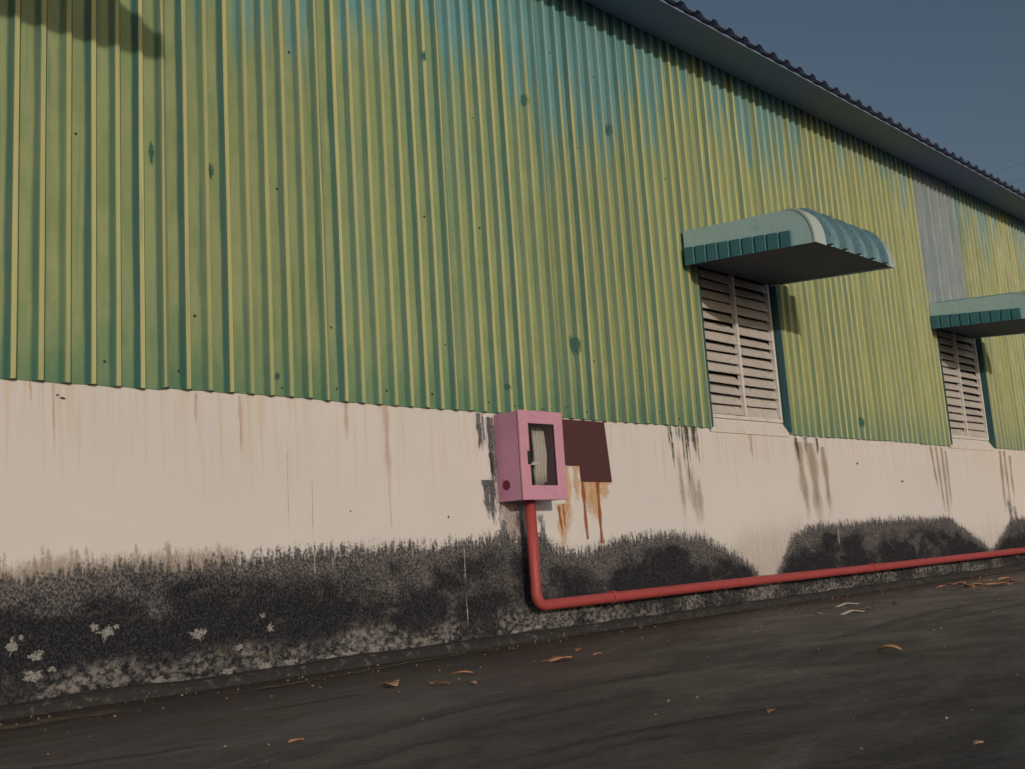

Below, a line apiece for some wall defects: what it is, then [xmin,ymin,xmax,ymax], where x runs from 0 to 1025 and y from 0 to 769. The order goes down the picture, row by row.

water stain [0,413,1025,706]
rust [558,465,609,543]